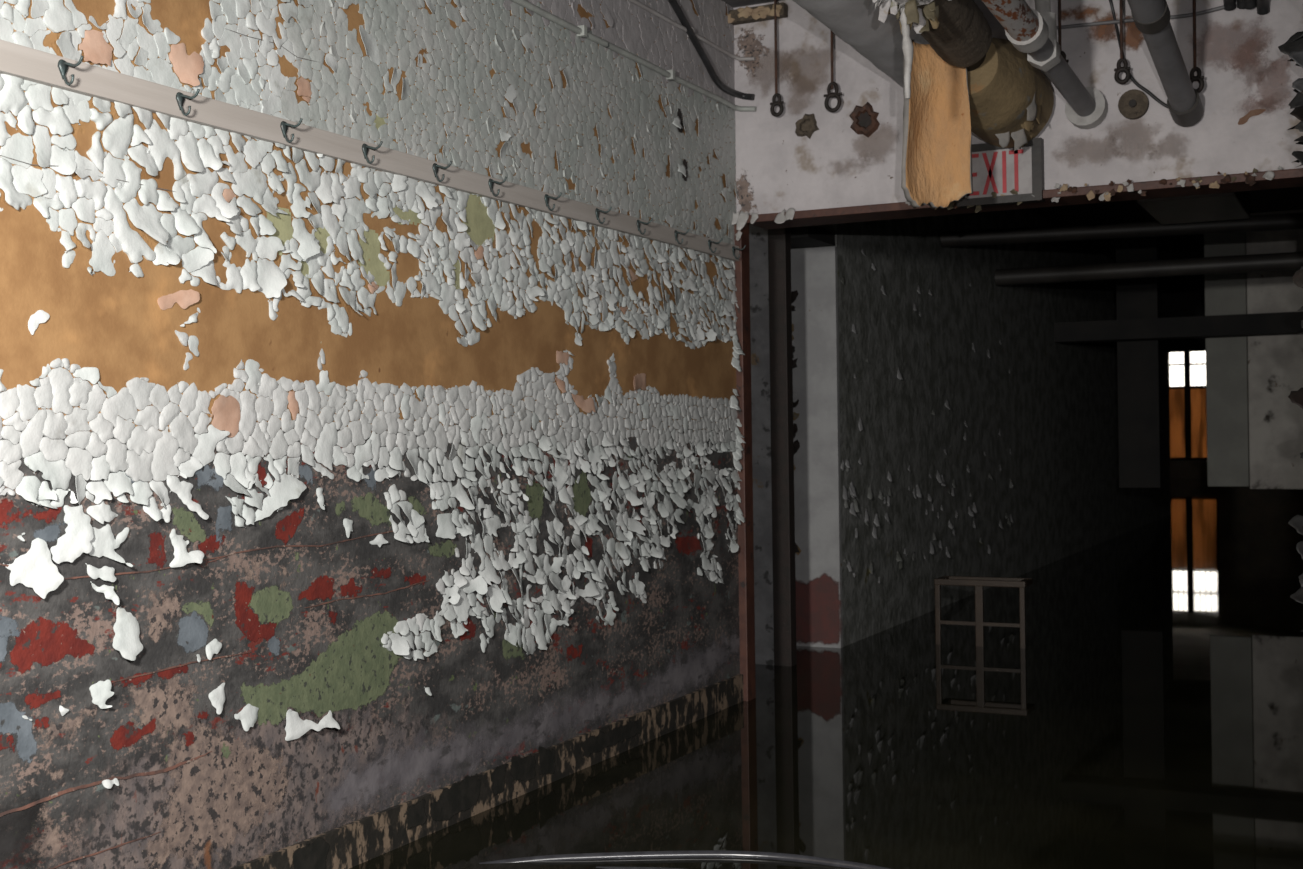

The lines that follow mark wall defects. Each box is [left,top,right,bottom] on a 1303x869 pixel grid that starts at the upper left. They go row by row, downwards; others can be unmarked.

flaking render [31,0,262,112]
peeling [251,0,315,103]
peeling [345,3,427,100]
spalling [726,3,782,77]
peeling [774,207,795,224]
flaking render [0,65,758,662]
peeling [1288,388,1303,409]
peeling [1288,514,1303,604]